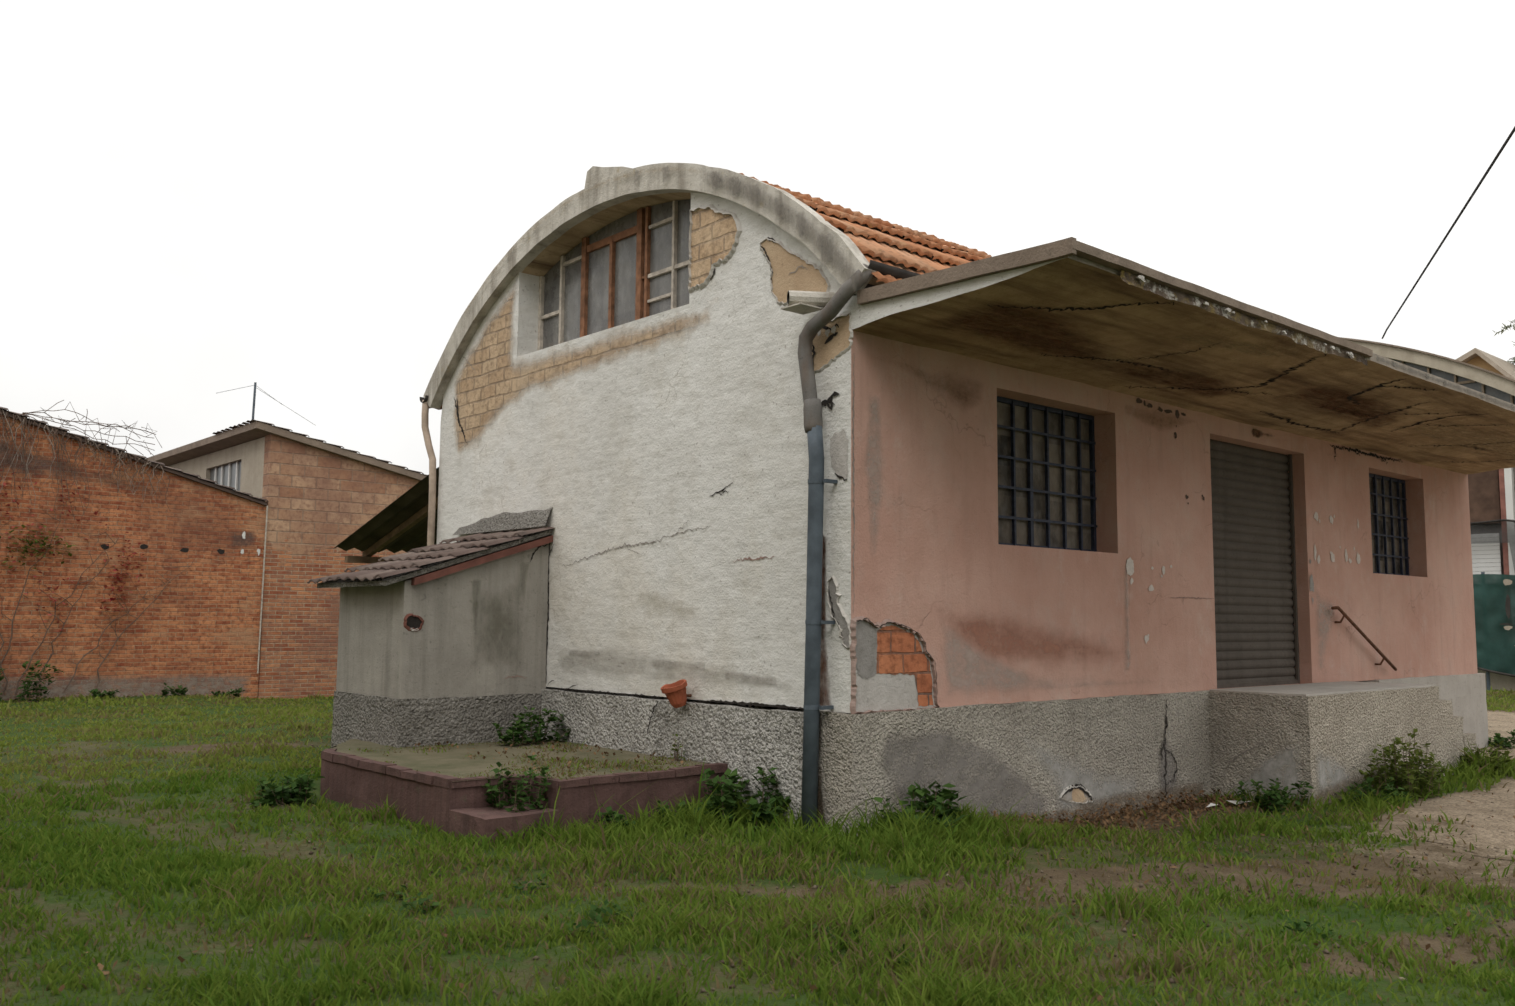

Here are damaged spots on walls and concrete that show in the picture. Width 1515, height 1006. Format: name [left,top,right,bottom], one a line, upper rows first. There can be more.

flaking render [688,204,742,293]
flaking render [760,237,831,306]
spalling [1120,270,1368,366]
crack [734,555,775,563]
flaking render [826,575,939,714]
crack [1161,700,1178,796]
spalling [1059,784,1094,805]